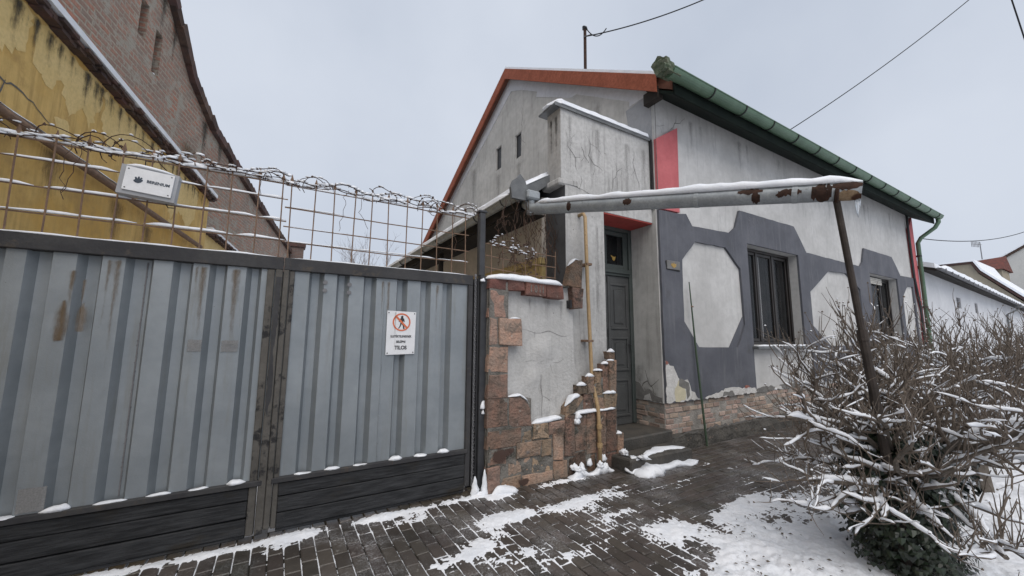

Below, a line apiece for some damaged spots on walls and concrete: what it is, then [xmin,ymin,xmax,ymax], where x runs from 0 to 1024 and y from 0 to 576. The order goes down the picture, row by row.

damp [34,19,74,63]
peeling [0,0,198,231]
crack [565,130,639,194]
corrosion [737,189,763,204]
corrosion [776,182,863,202]
peeling [636,361,800,404]